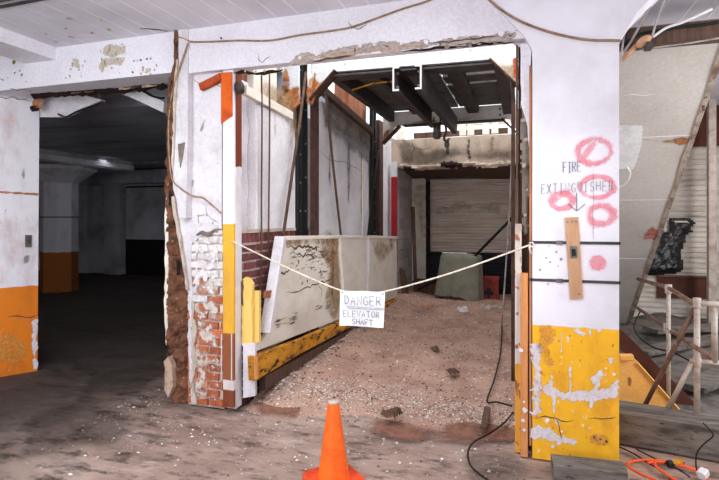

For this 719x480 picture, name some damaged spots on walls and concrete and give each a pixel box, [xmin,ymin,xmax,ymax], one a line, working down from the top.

peeling [289,30,517,66]
spalling [399,101,529,235]
flaking render [30,30,226,409]
crack [286,279,331,295]
damp [287,232,340,316]
peeling [0,318,38,369]
peeling [519,326,620,448]
crack [533,415,615,439]